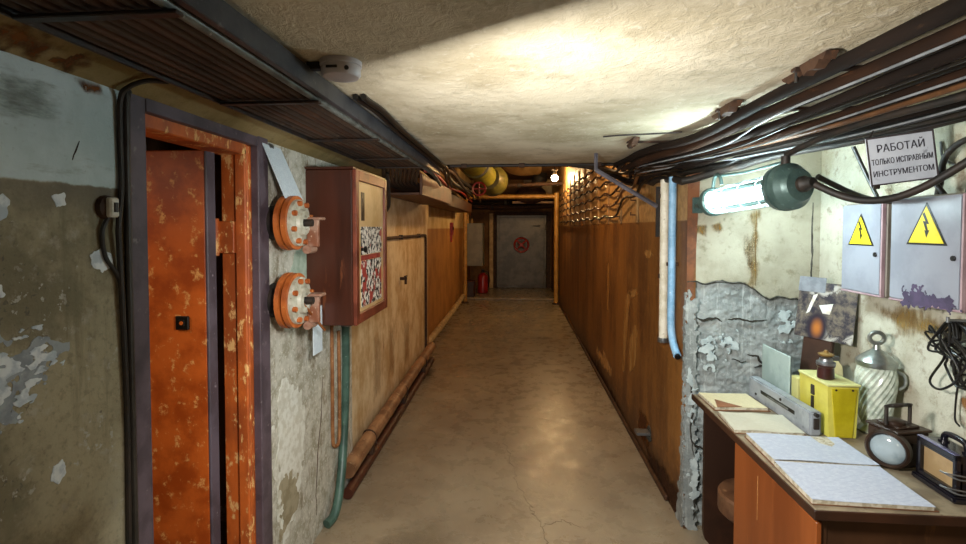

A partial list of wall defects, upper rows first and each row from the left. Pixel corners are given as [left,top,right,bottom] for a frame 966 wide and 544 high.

peeling [0,193,10,221]
peeling [51,192,66,207]
peeling [0,324,70,434]
flaking render [675,280,804,531]
peeling [50,459,66,484]